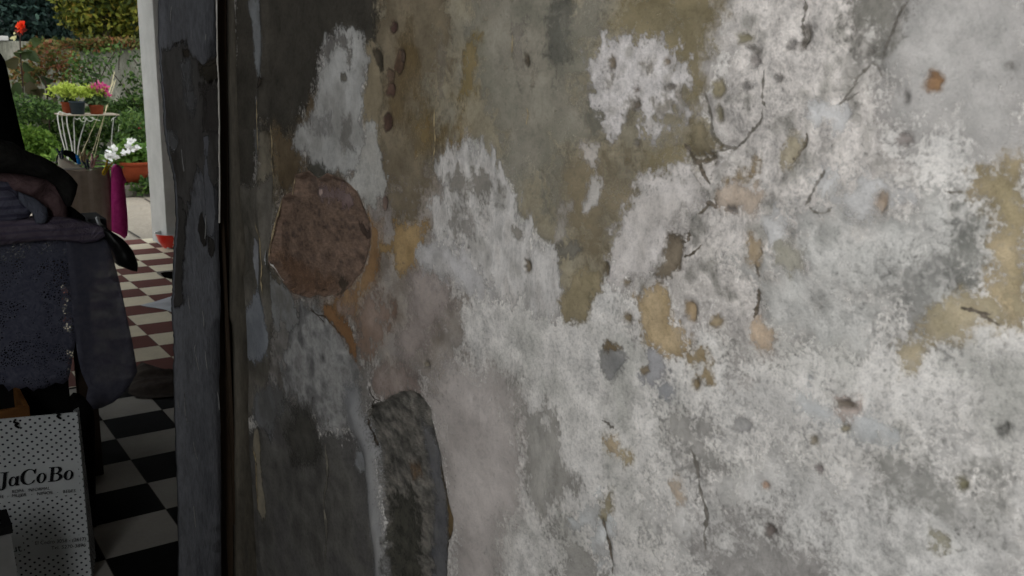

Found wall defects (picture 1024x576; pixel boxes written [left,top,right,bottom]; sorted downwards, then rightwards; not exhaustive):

crack [838,0,909,105]
water stain [347,120,389,210]
crack [672,74,766,258]
flaking render [255,26,450,576]
flaking render [655,233,684,281]
crack [689,446,709,550]